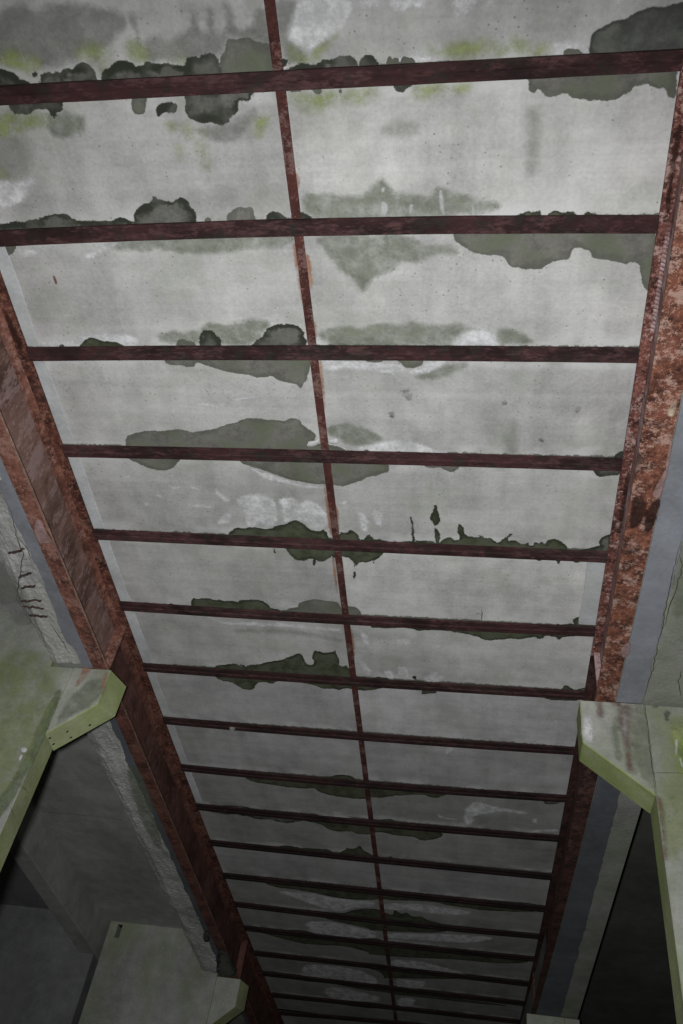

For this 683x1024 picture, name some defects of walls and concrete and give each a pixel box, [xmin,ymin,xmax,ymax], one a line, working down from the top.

damp [553,2,683,55]
damp [399,55,431,63]
damp [528,72,677,101]
damp [306,182,474,218]
damp [320,235,418,289]
flaking render [307,438,348,451]
crack [4,499,68,651]